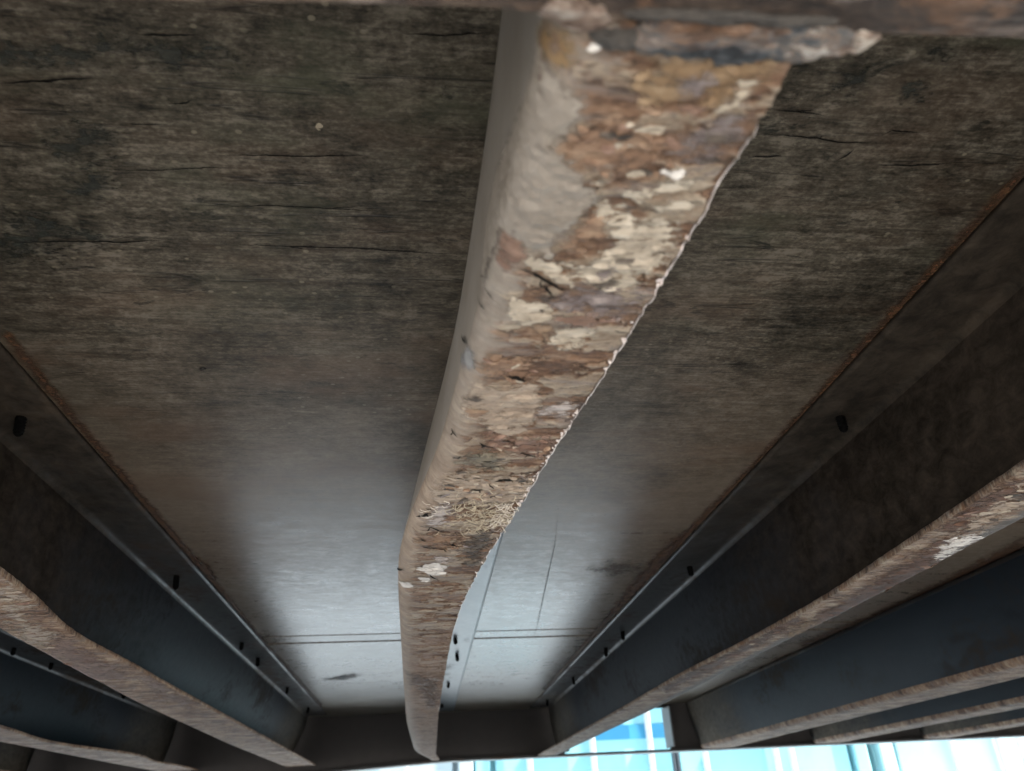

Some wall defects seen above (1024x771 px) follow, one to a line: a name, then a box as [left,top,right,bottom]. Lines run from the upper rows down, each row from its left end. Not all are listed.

crack [137,31,190,39]
crack [418,30,487,38]
crack [11,77,87,85]
crack [748,110,953,166]
crack [141,155,355,171]
crack [230,204,370,212]
crack [1,238,160,246]
crack [210,243,466,255]
peeling [430,28,758,628]
peeling [768,474,1024,635]
peeling [399,557,450,588]